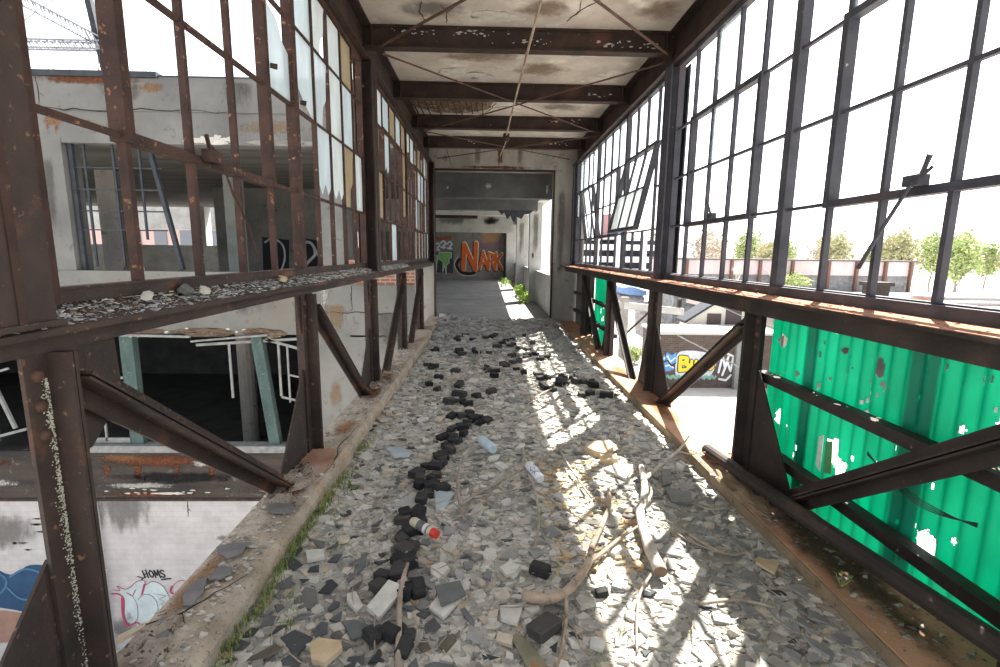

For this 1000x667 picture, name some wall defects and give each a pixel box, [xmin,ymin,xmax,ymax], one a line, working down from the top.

leakage [527,3,558,14]
peeling [456,11,526,37]
leakage [521,65,559,74]
rust [48,76,103,84]
rust [104,455,215,478]